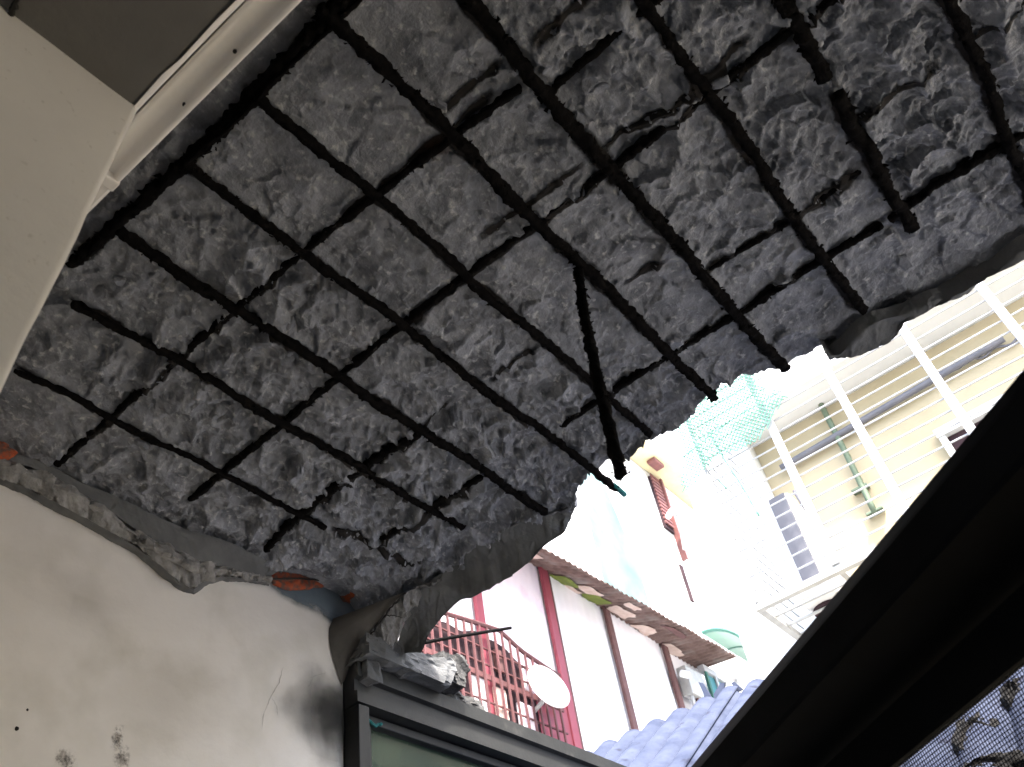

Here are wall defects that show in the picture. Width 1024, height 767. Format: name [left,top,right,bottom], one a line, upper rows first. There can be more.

spalling [0,0,776,685]
spalling [344,0,1024,373]